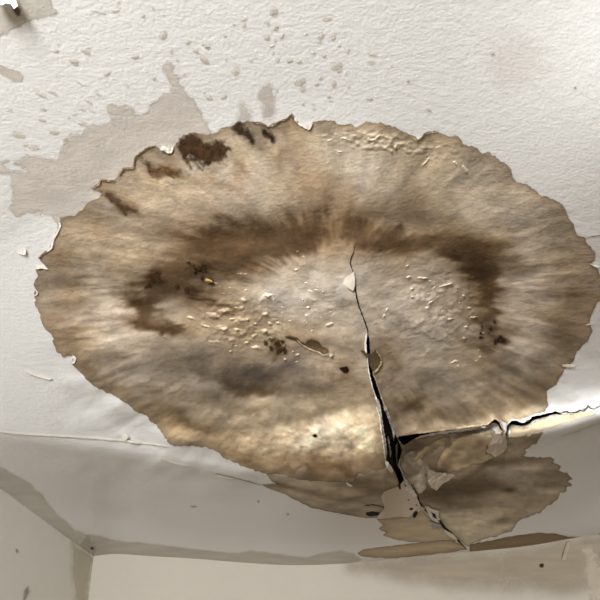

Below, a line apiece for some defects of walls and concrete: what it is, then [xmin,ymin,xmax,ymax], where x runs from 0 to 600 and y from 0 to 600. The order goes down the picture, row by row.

peeling [0,0,20,16]
water stain [0,63,600,518]
crack [343,246,600,547]
water stain [358,411,600,589]